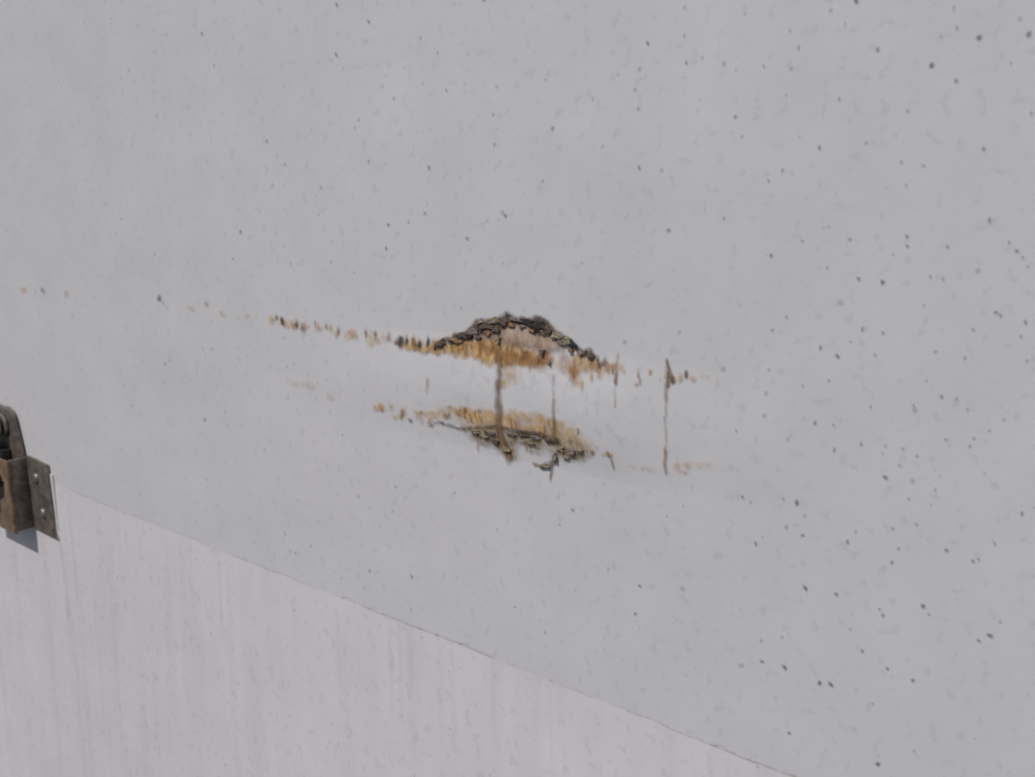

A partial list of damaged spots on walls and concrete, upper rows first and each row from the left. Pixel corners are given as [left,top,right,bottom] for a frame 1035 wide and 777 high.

corrosion [365,332,580,459]
peeling [434,312,595,364]